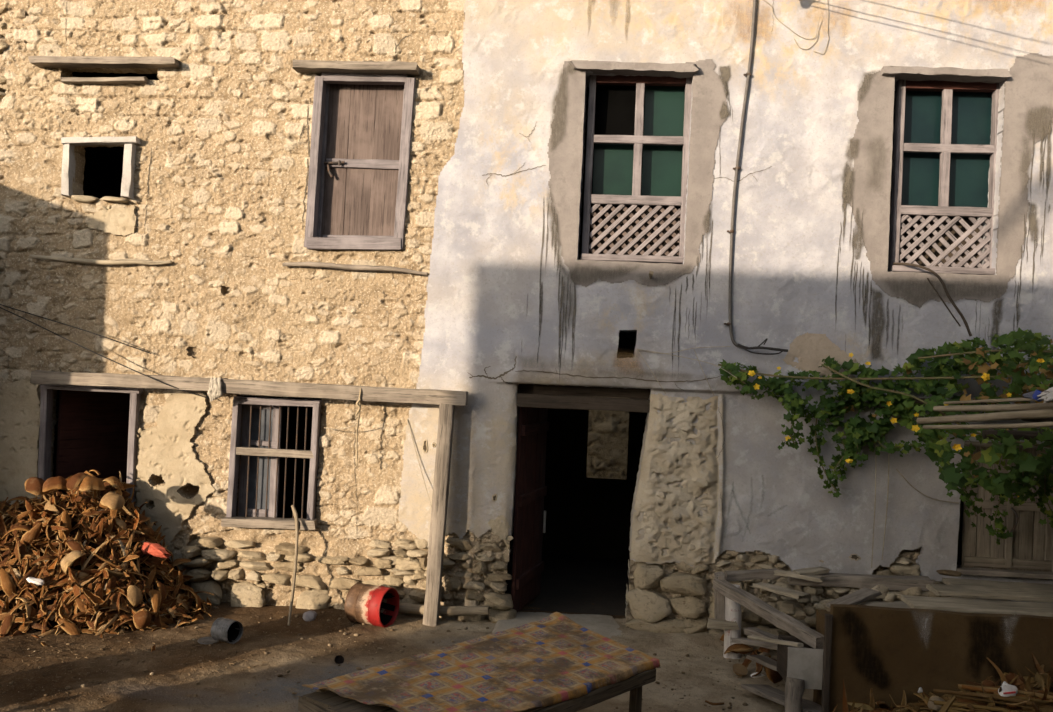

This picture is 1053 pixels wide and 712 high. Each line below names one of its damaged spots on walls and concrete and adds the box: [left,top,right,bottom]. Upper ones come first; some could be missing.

damp [860,72,875,99]
crack [486,124,546,184]
damp [537,196,628,367]
damp [835,140,900,359]
damp [991,300,1002,350]
damp [1013,107,1053,331]
peeling [136,391,216,574]
spalling [381,523,428,616]
spalling [439,515,517,623]